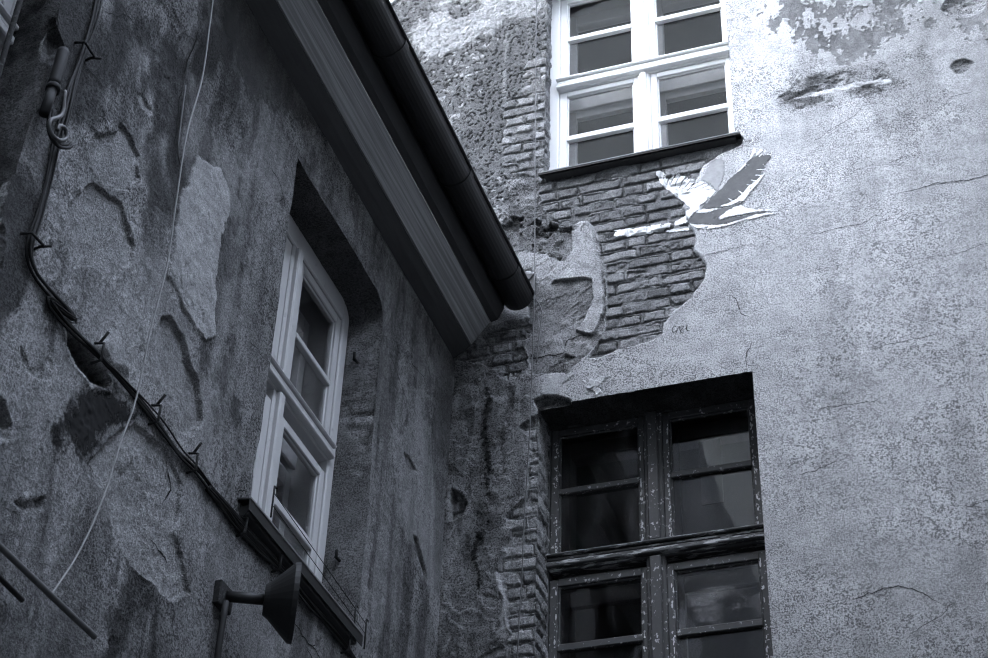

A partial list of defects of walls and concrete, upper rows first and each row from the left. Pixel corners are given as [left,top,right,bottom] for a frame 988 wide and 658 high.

peeling [748,0,988,114]
spalling [65,121,143,285]
spalling [18,328,114,393]
flaking render [146,154,230,439]
spalling [390,0,747,658]
spalling [0,390,13,450]
spalling [13,493,47,513]
spalling [87,420,192,603]
crack [848,585,958,634]